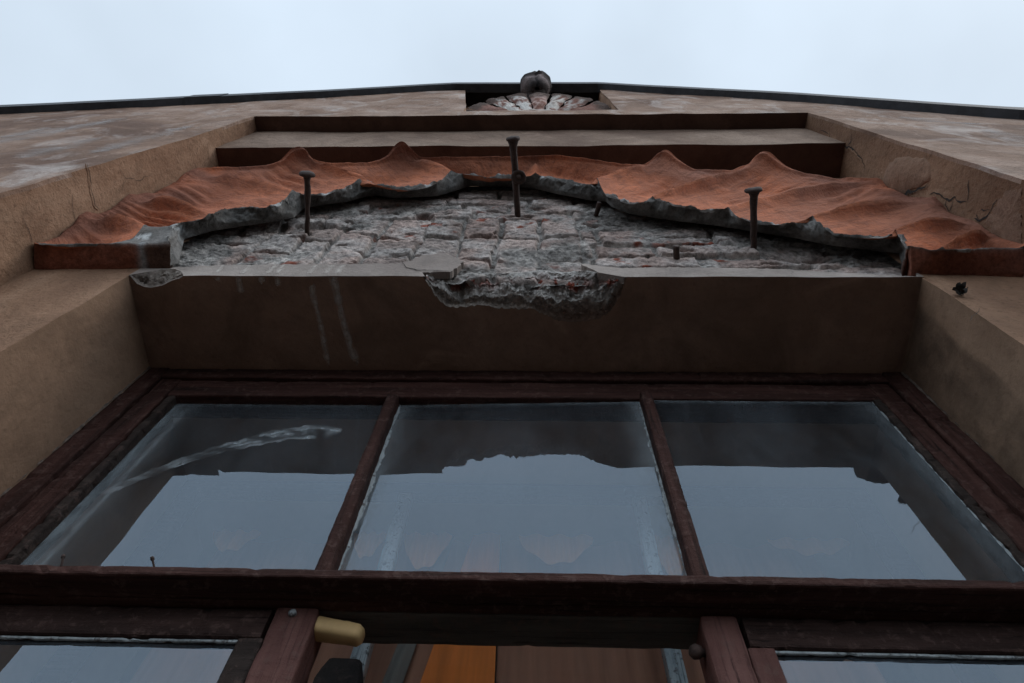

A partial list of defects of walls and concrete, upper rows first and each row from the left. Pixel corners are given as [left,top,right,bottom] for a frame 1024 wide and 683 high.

spalling [34,170,1024,288]
crack [931,180,997,222]
flaking render [403,263,623,322]